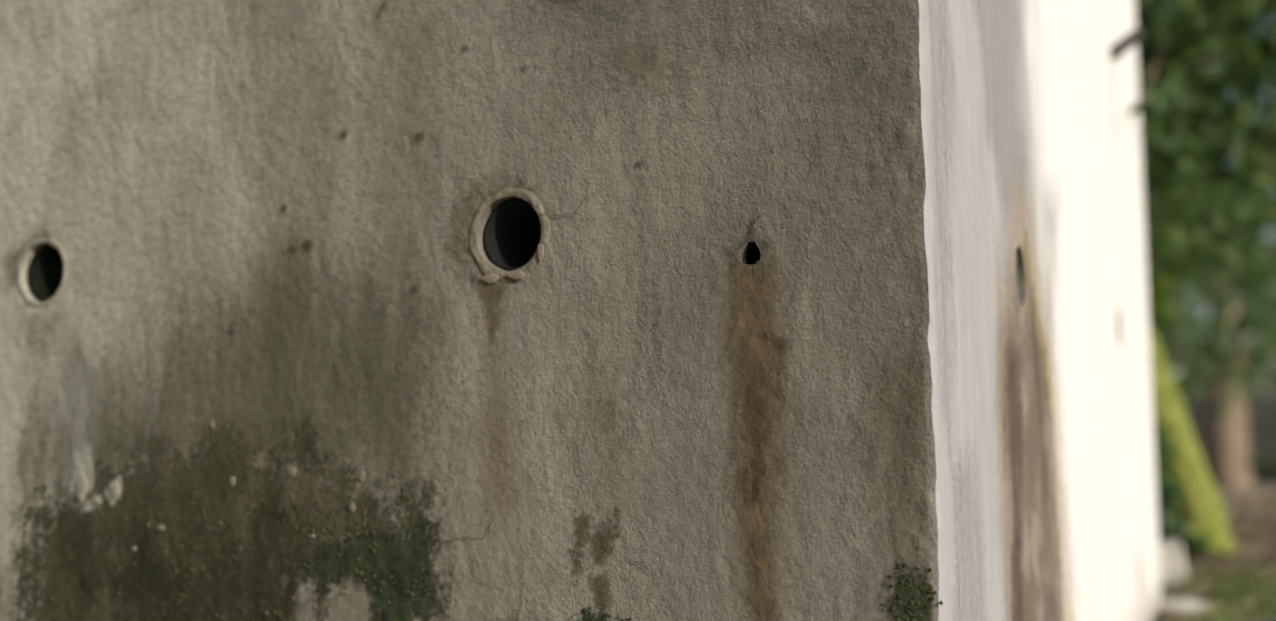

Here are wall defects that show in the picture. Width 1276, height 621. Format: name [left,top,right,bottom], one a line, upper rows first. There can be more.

mould [570,508,622,586]
corrosion [727,259,786,621]
water stain [999,195,1073,621]